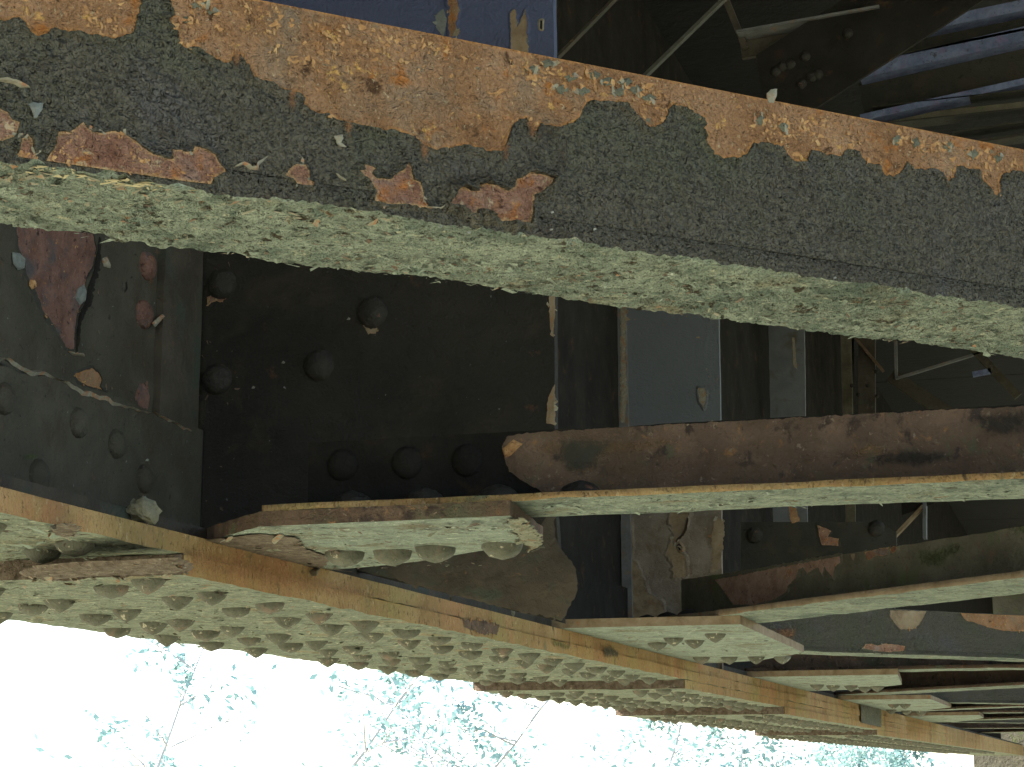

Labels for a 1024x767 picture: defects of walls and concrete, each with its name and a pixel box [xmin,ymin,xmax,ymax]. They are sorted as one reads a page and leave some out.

rust [160,0,1024,235]
rust [14,227,98,352]
rust [502,385,1024,492]
rust [663,512,693,582]